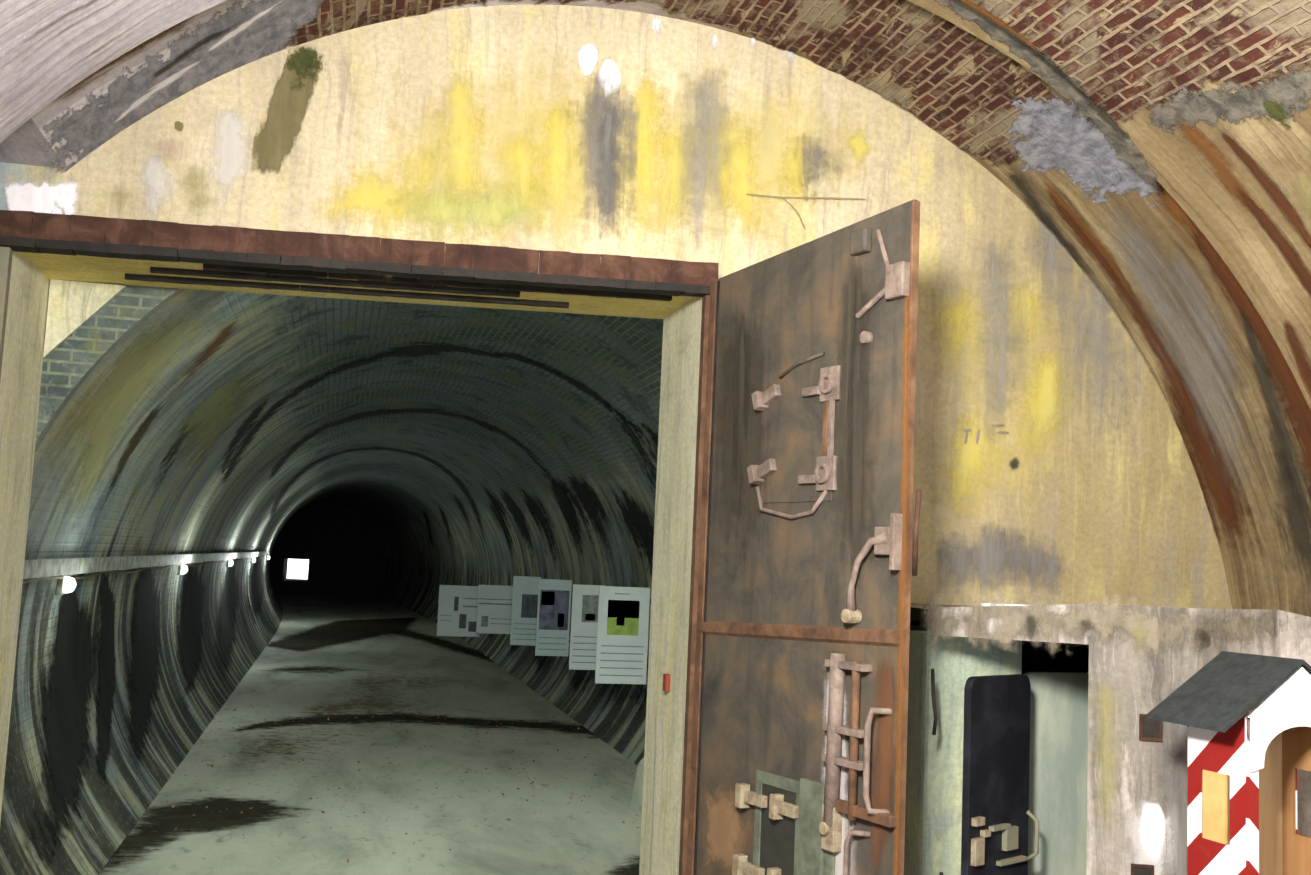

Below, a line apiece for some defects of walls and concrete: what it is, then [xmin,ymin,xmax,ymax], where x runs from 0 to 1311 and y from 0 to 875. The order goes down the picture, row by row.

damp [447,80,481,199]
damp [502,44,760,223]
flaking render [5,0,1311,230]
damp [784,146,825,187]
rust [1180,123,1311,297]
rust [1011,174,1252,546]
rust [1157,181,1311,494]
rust [704,789,745,870]